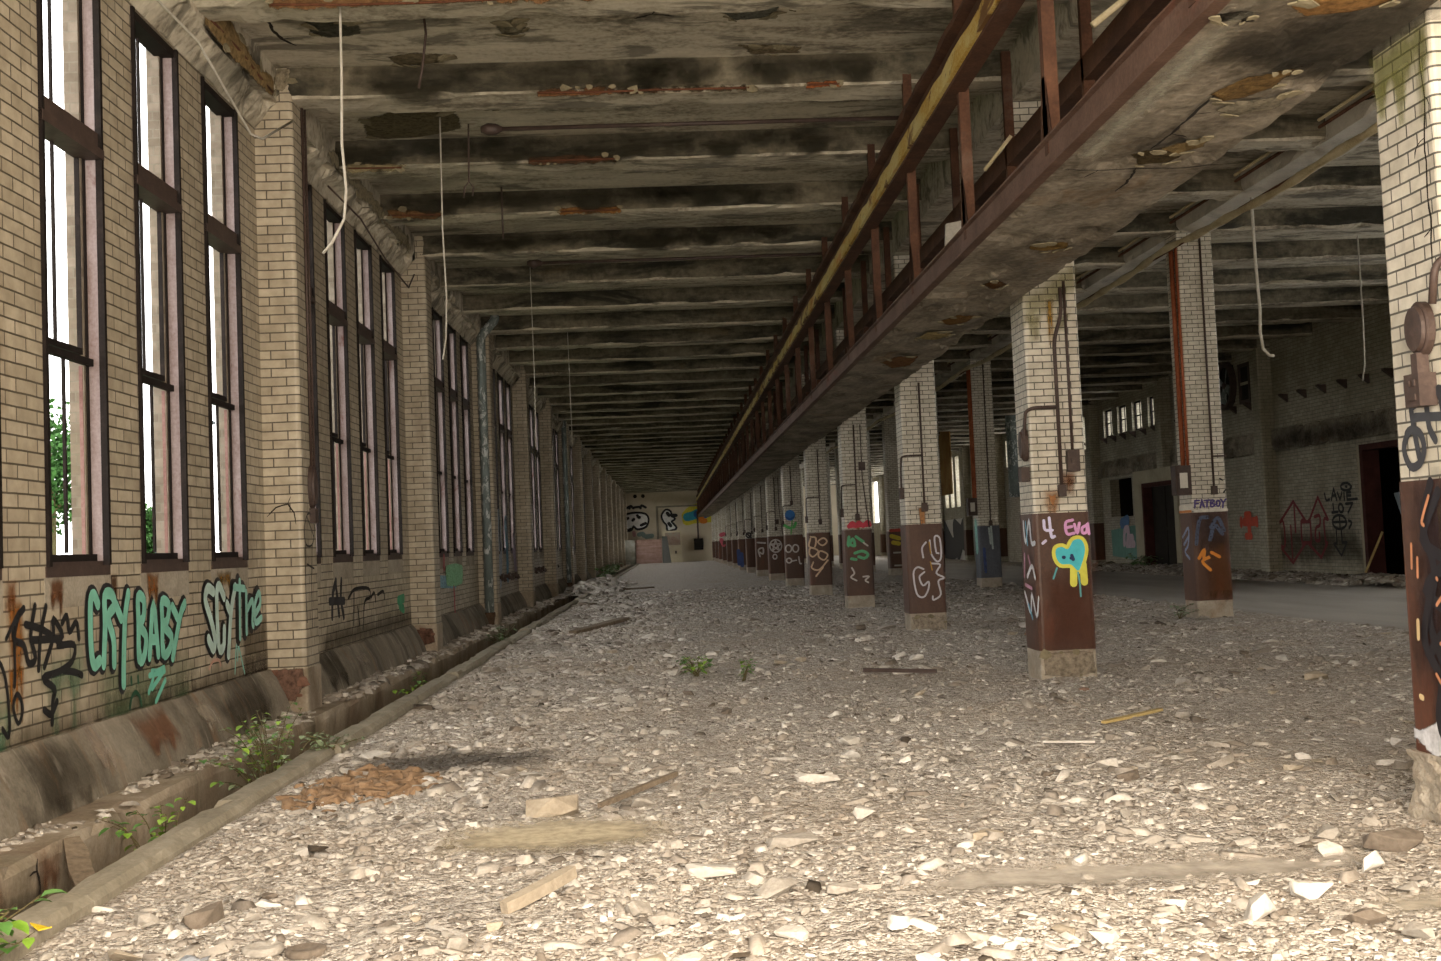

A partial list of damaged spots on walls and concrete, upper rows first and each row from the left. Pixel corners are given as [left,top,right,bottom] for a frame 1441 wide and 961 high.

spalling [1287,0,1400,16]
spalling [1209,67,1304,118]
damp [1081,2,1441,157]